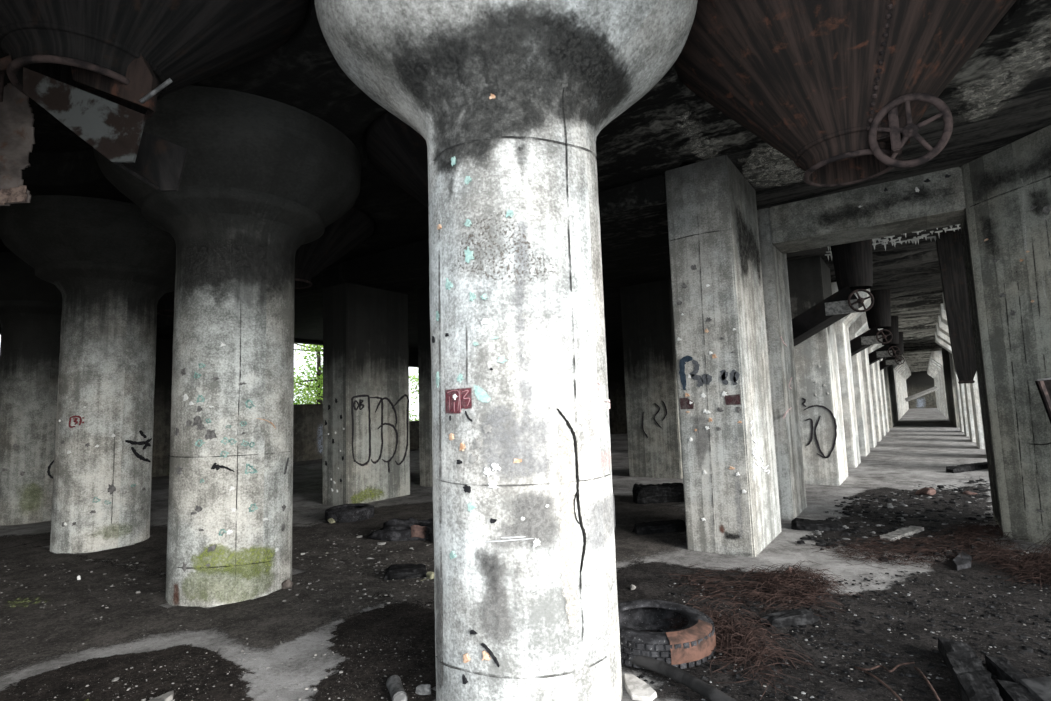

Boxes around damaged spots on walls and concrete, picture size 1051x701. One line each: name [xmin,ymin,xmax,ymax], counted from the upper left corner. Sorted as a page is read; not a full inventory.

rust [0,73,35,206]